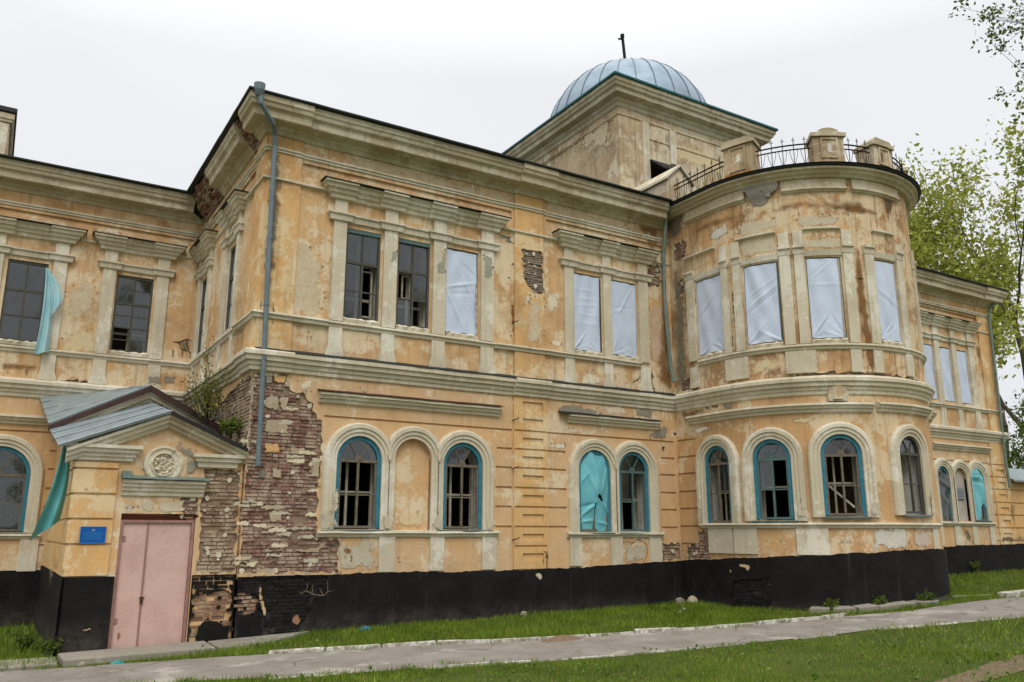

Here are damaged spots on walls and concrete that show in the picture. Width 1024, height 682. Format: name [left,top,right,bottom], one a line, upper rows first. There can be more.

flaking render [508,249,562,346]
flaking render [647,263,662,286]
flaking render [673,240,687,261]
flaking render [168,372,342,641]
flaking render [662,509,710,562]